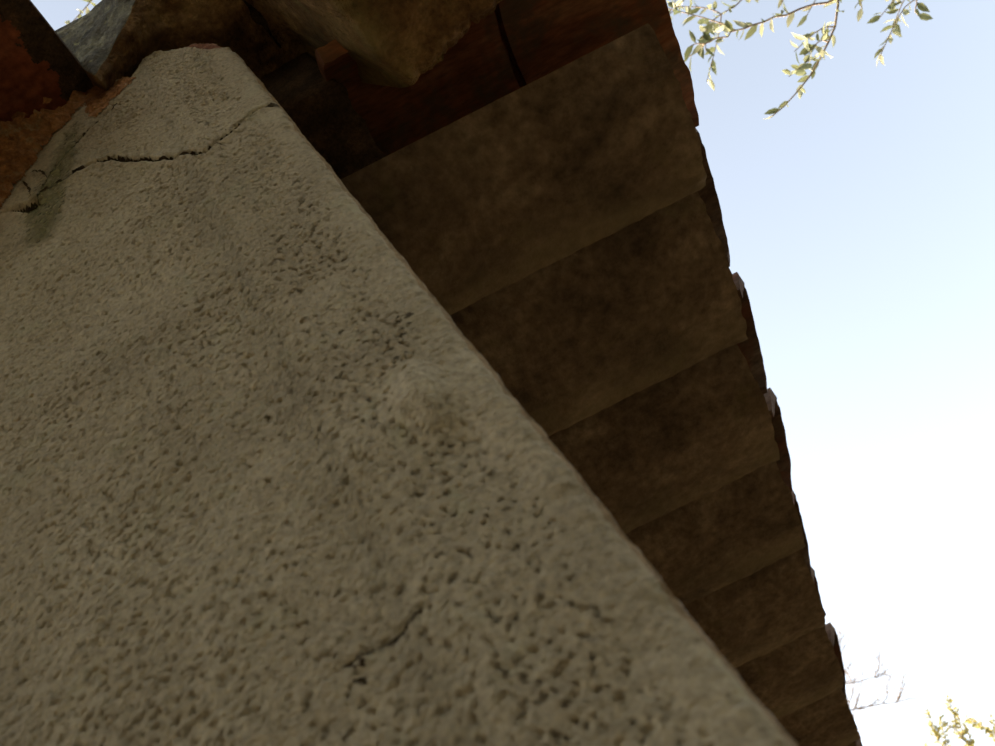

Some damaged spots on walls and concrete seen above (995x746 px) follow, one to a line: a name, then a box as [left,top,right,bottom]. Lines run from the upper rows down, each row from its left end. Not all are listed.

crack [13,103,267,213]